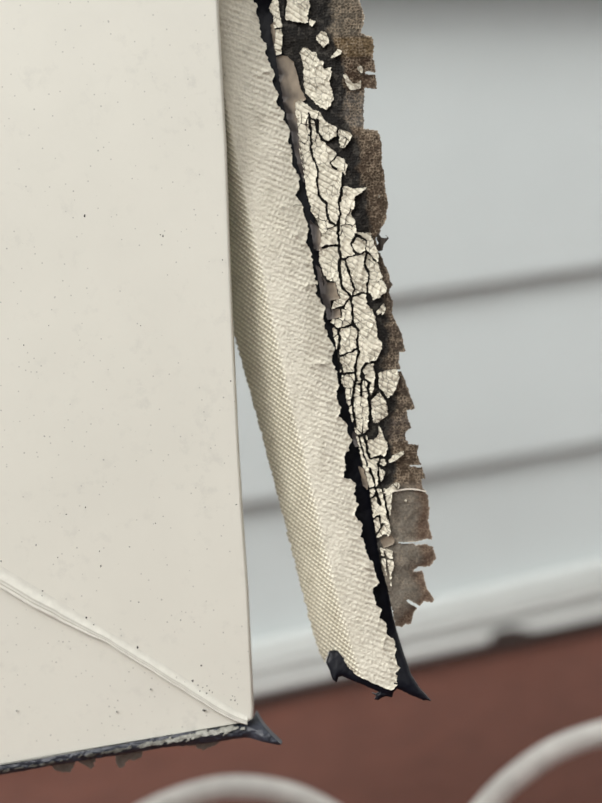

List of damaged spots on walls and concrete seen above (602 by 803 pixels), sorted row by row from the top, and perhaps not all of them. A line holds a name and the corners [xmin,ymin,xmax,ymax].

peeling [269,0,404,538]
peeling [380,548,394,586]